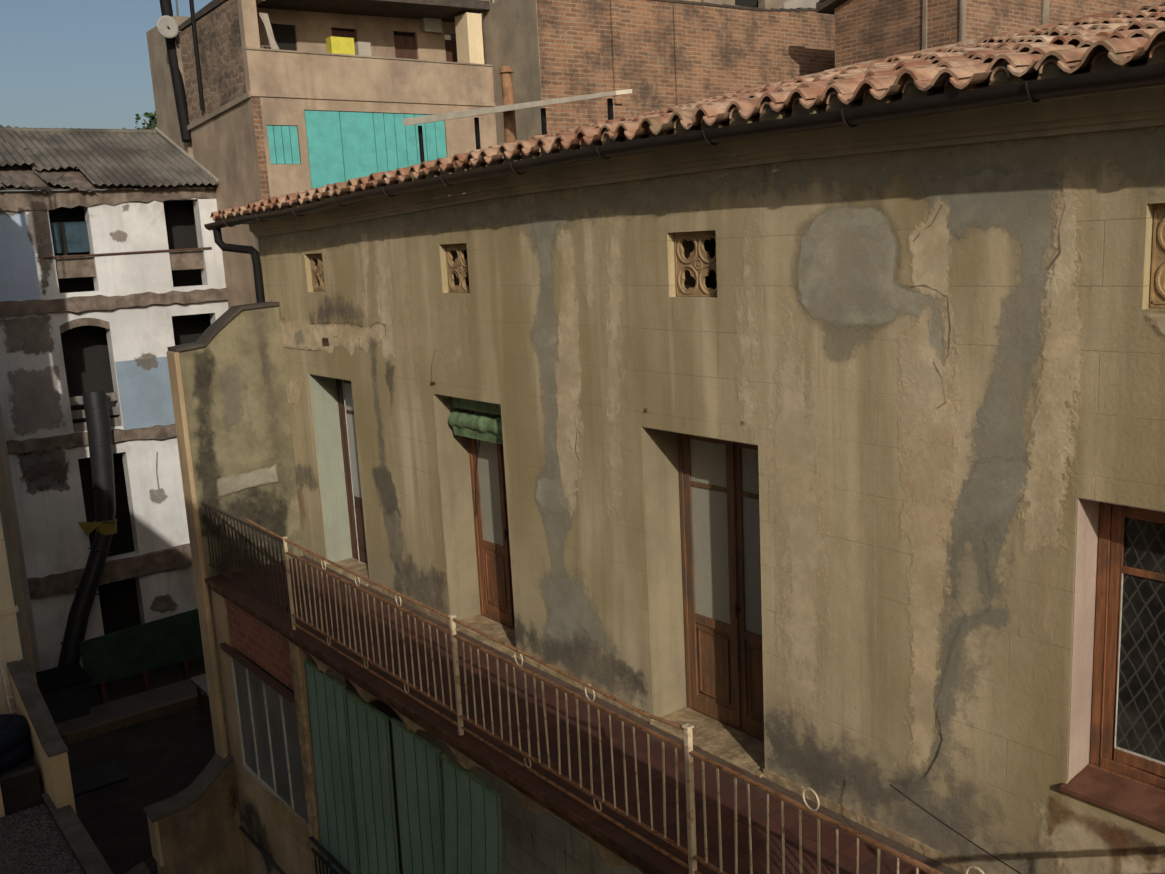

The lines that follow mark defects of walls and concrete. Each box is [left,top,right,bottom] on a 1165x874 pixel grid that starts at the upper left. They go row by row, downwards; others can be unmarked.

spalling [0,210,53,294]
spalling [0,315,65,437]
spalling [15,448,70,495]
water stain [194,353,288,575]
water stain [311,233,443,610]
water stain [736,228,976,862]
peeling [897,197,959,771]
crack [916,165,1061,782]
peeling [1018,167,1083,553]
water stain [1039,808,1164,874]